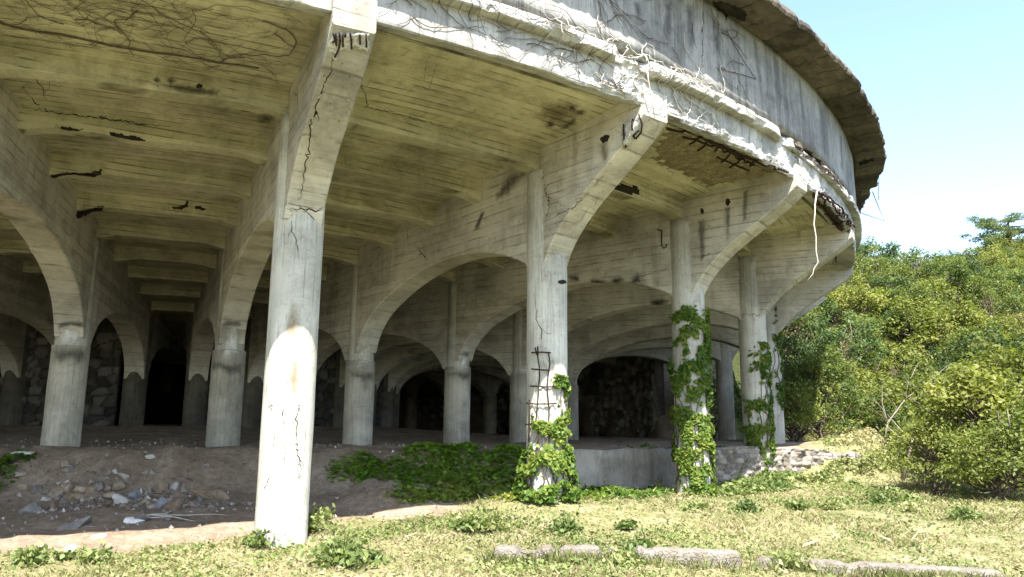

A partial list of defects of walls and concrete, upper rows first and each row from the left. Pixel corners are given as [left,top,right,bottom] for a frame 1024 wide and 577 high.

spalling [328,32,370,61]
crack [21,87,170,127]
spalling [109,132,146,141]
crack [288,49,474,257]
spalling [566,70,860,235]
spalling [50,169,102,178]
spalling [76,205,105,219]